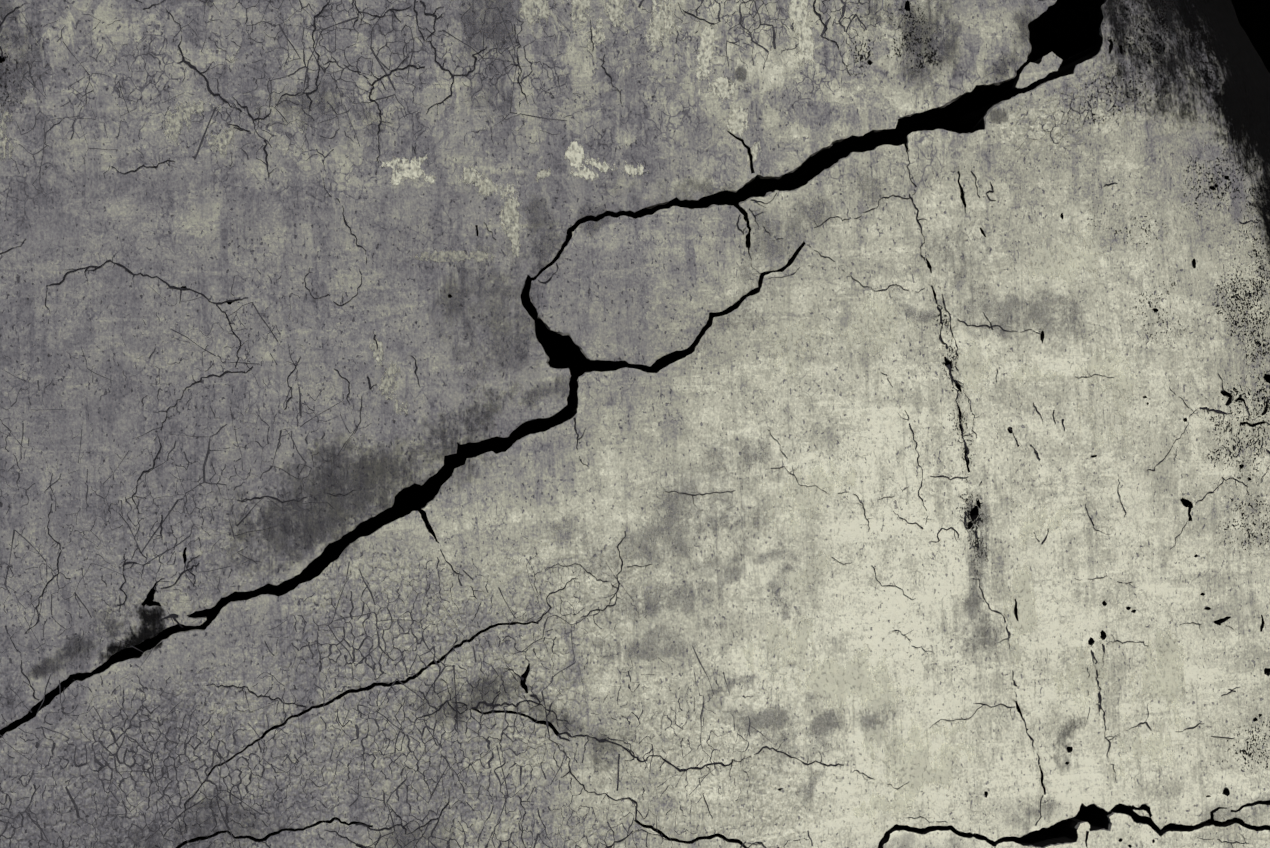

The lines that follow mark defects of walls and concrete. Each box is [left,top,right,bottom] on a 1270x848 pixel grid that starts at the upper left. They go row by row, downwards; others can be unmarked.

crack [613,0,886,79]
crack [0,2,175,197]
crack [136,0,622,320]
crack [1014,72,1125,151]
leakage [1073,0,1270,556]
crack [296,369,371,457]
crack [767,429,969,542]
crack [1085,387,1230,534]
crack [832,557,935,654]
crack [927,703,1012,740]
leakage [1217,717,1270,776]
crack [878,800,1270,848]